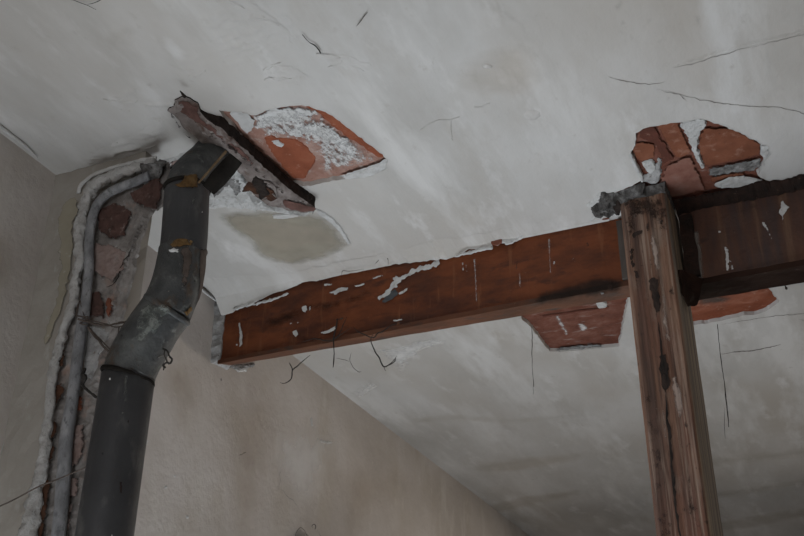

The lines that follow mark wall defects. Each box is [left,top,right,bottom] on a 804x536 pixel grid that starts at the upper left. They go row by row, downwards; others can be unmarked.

crack [679,35,801,67]
flaking render [219,104,389,187]
flaking render [614,118,772,210]
flaking render [209,171,314,216]
flaking render [42,120,187,536]
flaking render [520,298,629,352]
flaking render [691,288,780,325]